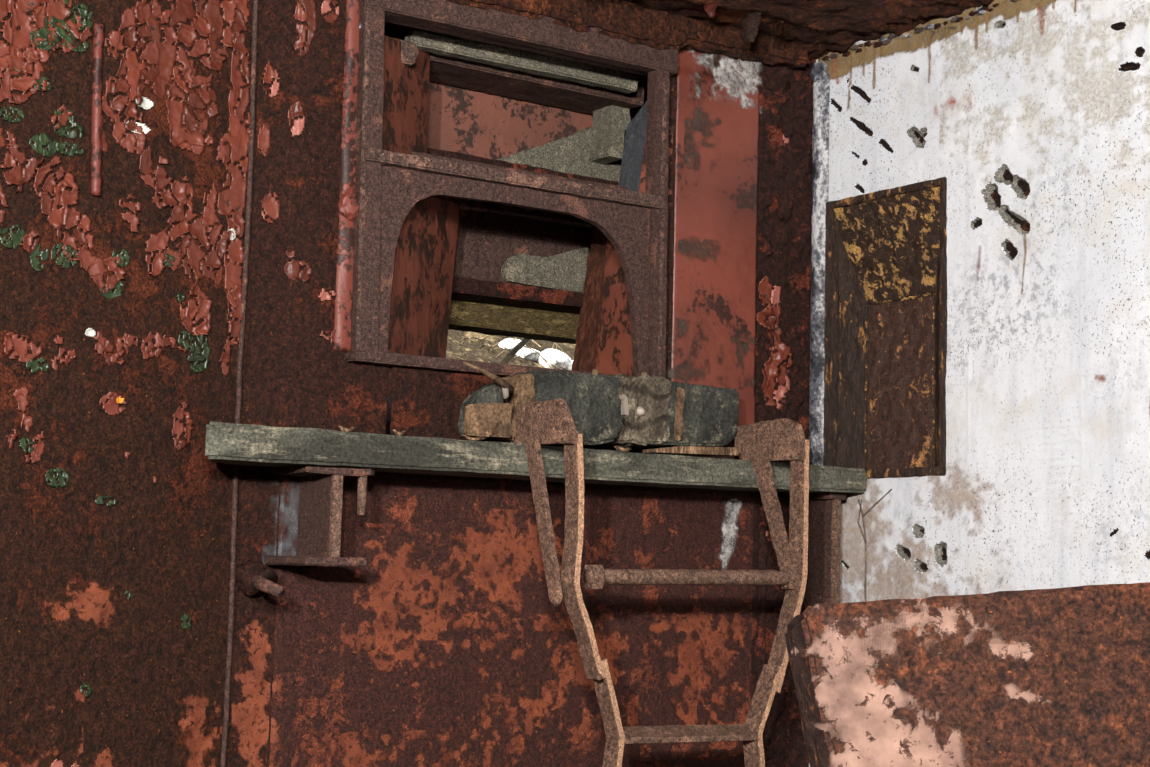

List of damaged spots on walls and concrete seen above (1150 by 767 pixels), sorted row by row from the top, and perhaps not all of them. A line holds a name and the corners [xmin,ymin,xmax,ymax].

water stain [818,0,1059,109]
peeling [0,0,280,375]
spalling [971,164,1030,281]
peeling [6,387,71,489]
peeling [99,392,127,416]
peeling [172,401,193,450]
spalling [895,524,948,573]
corrosion [43,582,115,627]
corrosion [178,620,283,767]
corrosion [291,509,607,767]
corrosion [594,602,745,727]
corrosion [95,748,113,767]